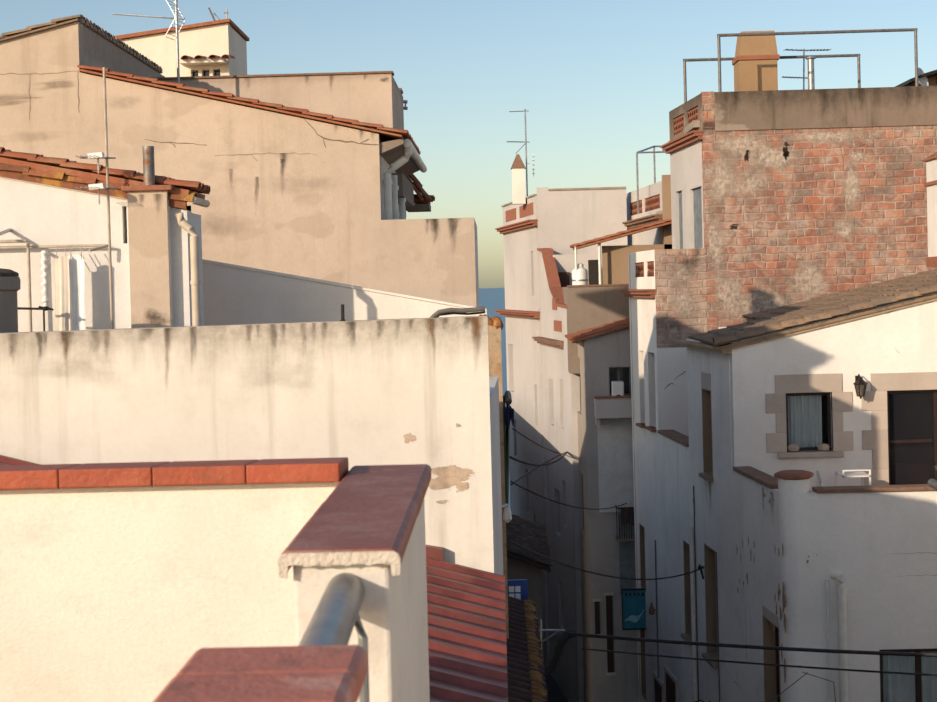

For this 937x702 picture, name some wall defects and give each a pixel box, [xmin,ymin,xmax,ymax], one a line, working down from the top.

crack [0,71,70,120]
crack [145,119,380,161]
peeling [429,465,474,504]
peeling [770,581,786,633]